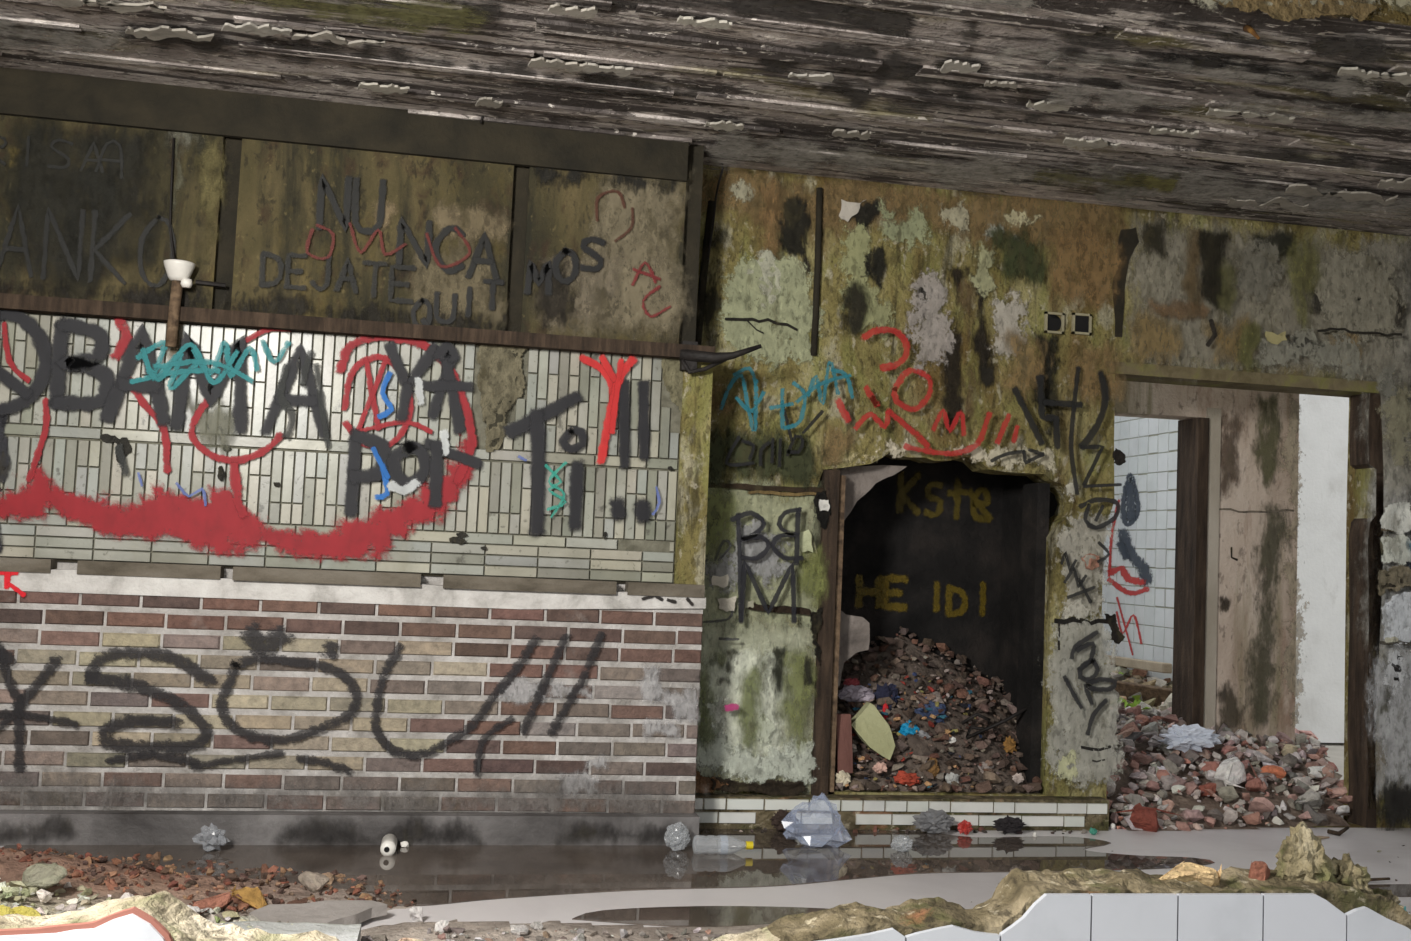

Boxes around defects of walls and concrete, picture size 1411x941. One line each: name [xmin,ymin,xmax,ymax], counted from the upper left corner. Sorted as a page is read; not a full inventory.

peeling [51,0,385,47]
leakage [603,0,1411,131]
spalling [1190,0,1411,22]
leakage [536,175,683,335]
crack [725,318,798,334]
peeling [954,438,1056,472]
leakage [699,131,1411,688]
leakage [499,678,591,703]
leakage [641,479,826,786]
peeling [1044,482,1125,793]
leakage [1246,506,1291,725]
peeling [1367,501,1411,788]